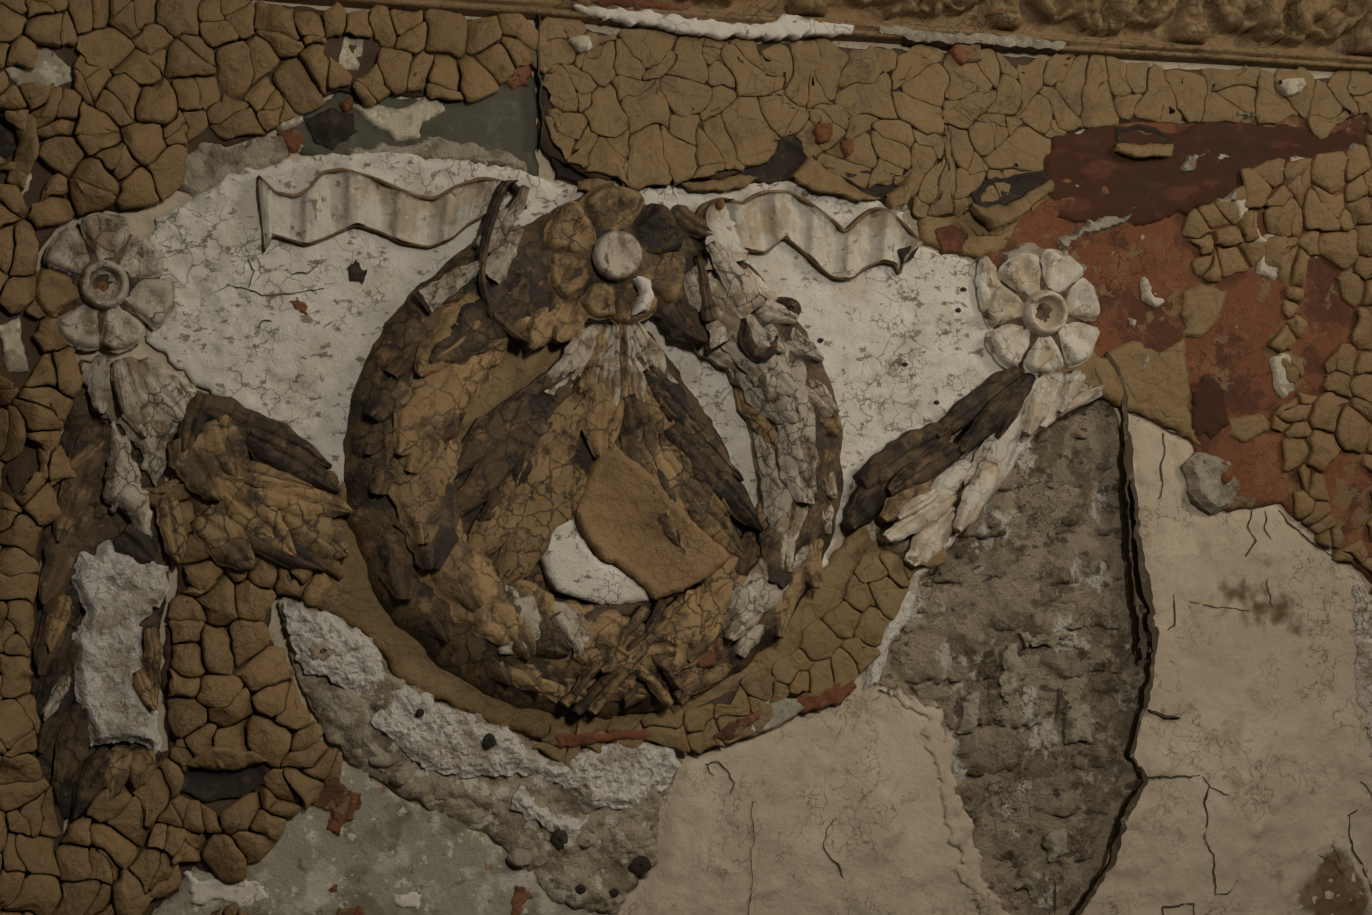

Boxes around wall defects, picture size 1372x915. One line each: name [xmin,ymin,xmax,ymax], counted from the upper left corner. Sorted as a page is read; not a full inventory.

crack [0,0,539,915]
spalling [152,596,682,915]
flaking render [145,63,917,507]
flaking render [497,519,649,655]
peeling [573,4,854,43]
crack [532,546,947,795]
flaking render [744,240,1004,568]
crack [534,14,1372,352]
flaking render [862,387,1147,915]
crack [1069,352,1273,915]
crack [1270,306,1372,573]
crack [1318,781,1372,893]